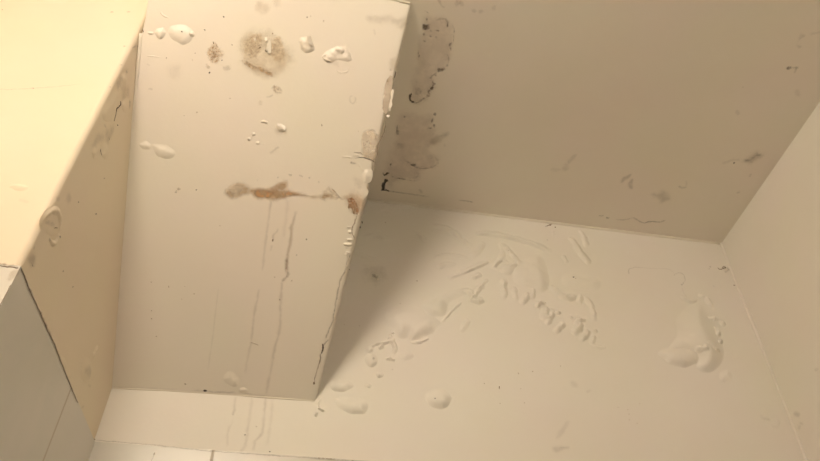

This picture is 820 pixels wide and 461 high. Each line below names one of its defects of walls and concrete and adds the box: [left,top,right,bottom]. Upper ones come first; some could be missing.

crack [313,344,325,385]